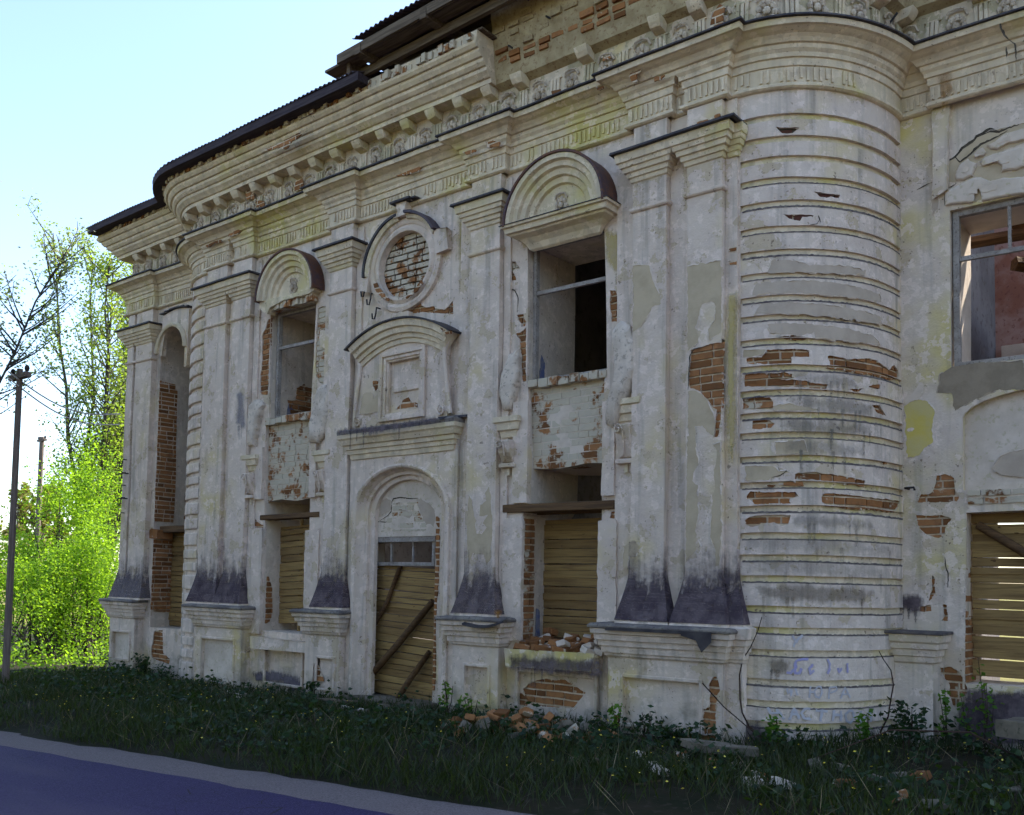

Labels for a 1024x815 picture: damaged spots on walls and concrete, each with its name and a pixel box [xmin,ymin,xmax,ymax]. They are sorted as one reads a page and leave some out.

crack [917,124,1019,205]
peeling [743,279,883,429]
flaking render [826,356,898,392]
peeling [686,245,737,566]
flaking render [745,472,898,527]
peeling [916,448,1024,538]
leakage [108,572,151,598]
leakage [186,569,248,604]
leakage [309,566,350,608]
leakage [451,575,504,615]
leakage [614,560,921,636]
flaking render [520,678,585,708]